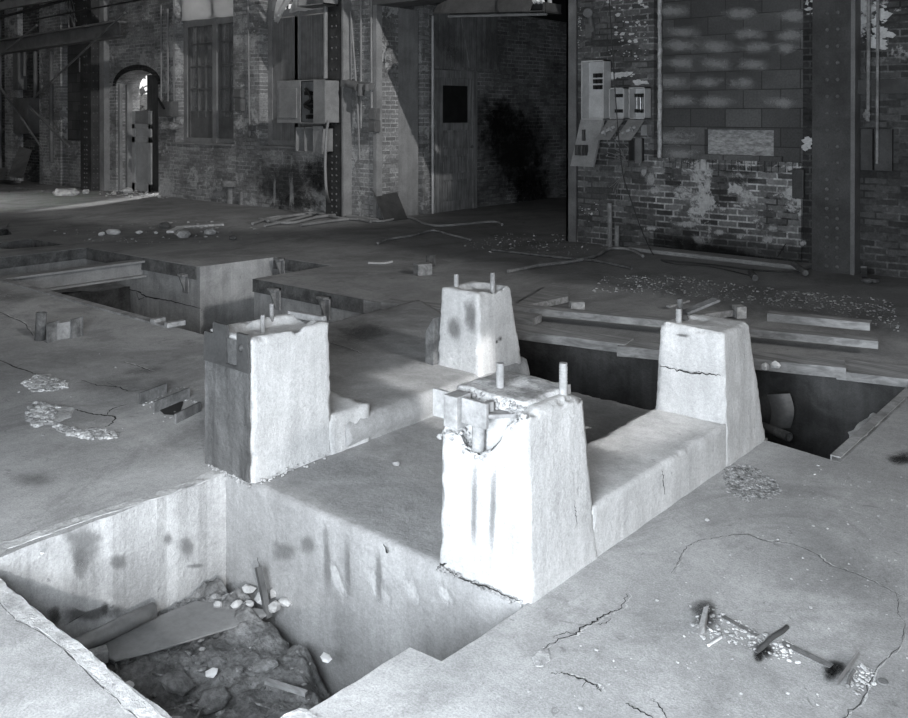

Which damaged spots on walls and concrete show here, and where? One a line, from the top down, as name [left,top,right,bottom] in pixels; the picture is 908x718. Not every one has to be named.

crack [661,366,718,376]
spalling [20,373,119,440]
water stain [69,534,94,574]
crack [543,594,632,649]
crack [671,534,908,718]
crack [554,671,606,692]
crack [626,701,667,718]